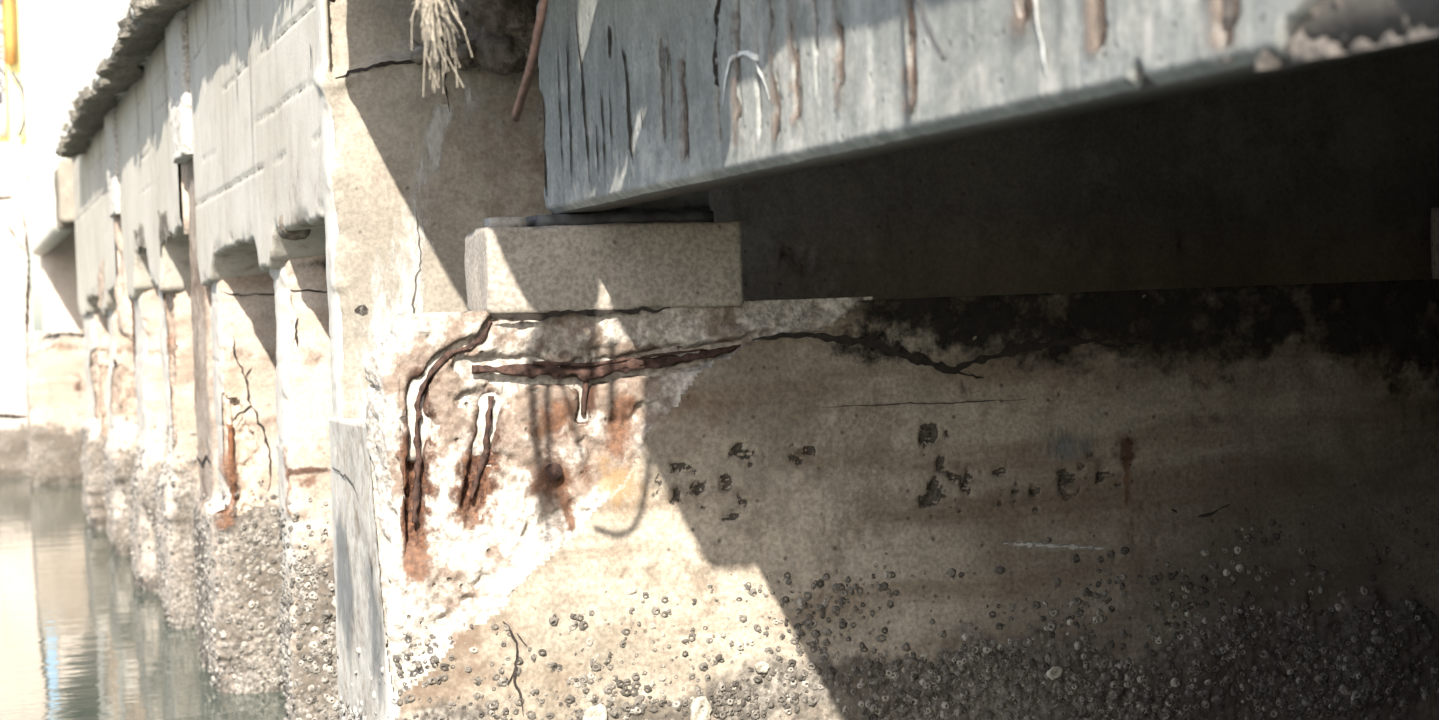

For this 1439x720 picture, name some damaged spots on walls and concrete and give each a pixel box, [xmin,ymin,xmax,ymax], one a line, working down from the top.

rust [215,455,237,529]
crack [232,336,272,490]
rust [397,367,501,582]
rust [529,383,644,530]
spalling [364,297,873,696]
water stain [835,279,1439,393]